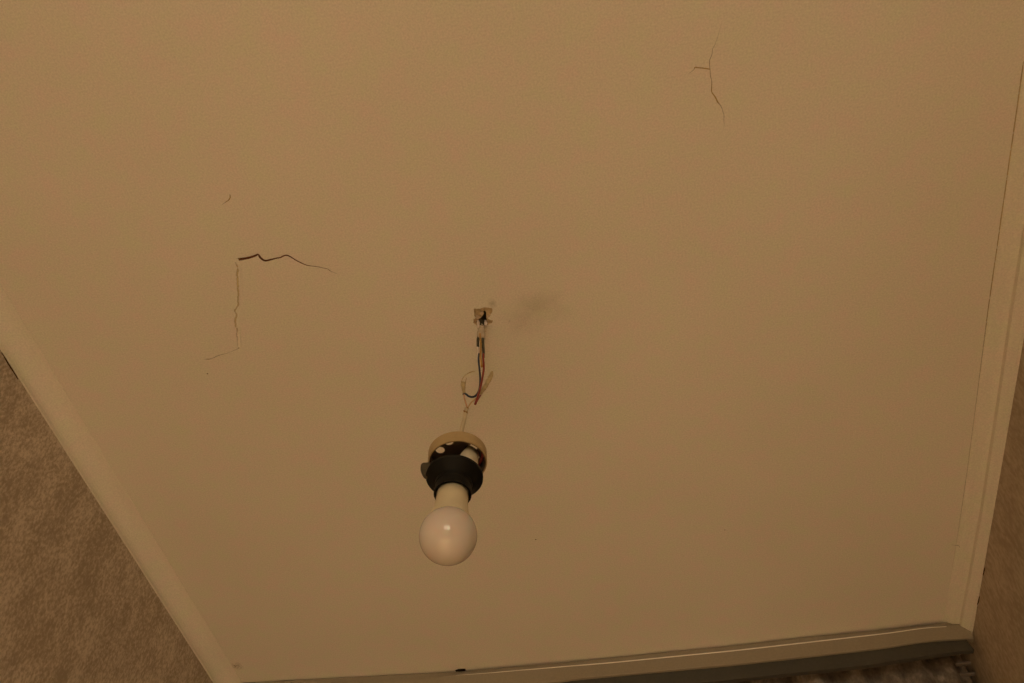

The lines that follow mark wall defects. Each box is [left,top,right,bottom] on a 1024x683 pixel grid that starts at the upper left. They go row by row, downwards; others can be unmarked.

crack [238,254,330,271]